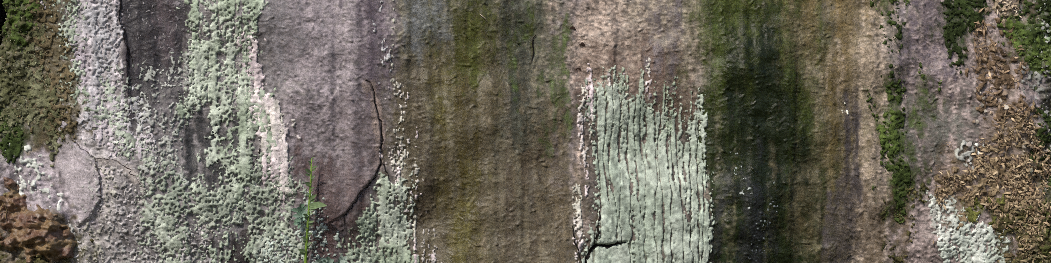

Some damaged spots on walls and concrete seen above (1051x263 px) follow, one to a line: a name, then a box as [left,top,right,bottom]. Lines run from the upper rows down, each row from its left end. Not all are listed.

crack [341,80,389,236]
water stain [592,0,909,263]
crack [572,211,626,263]